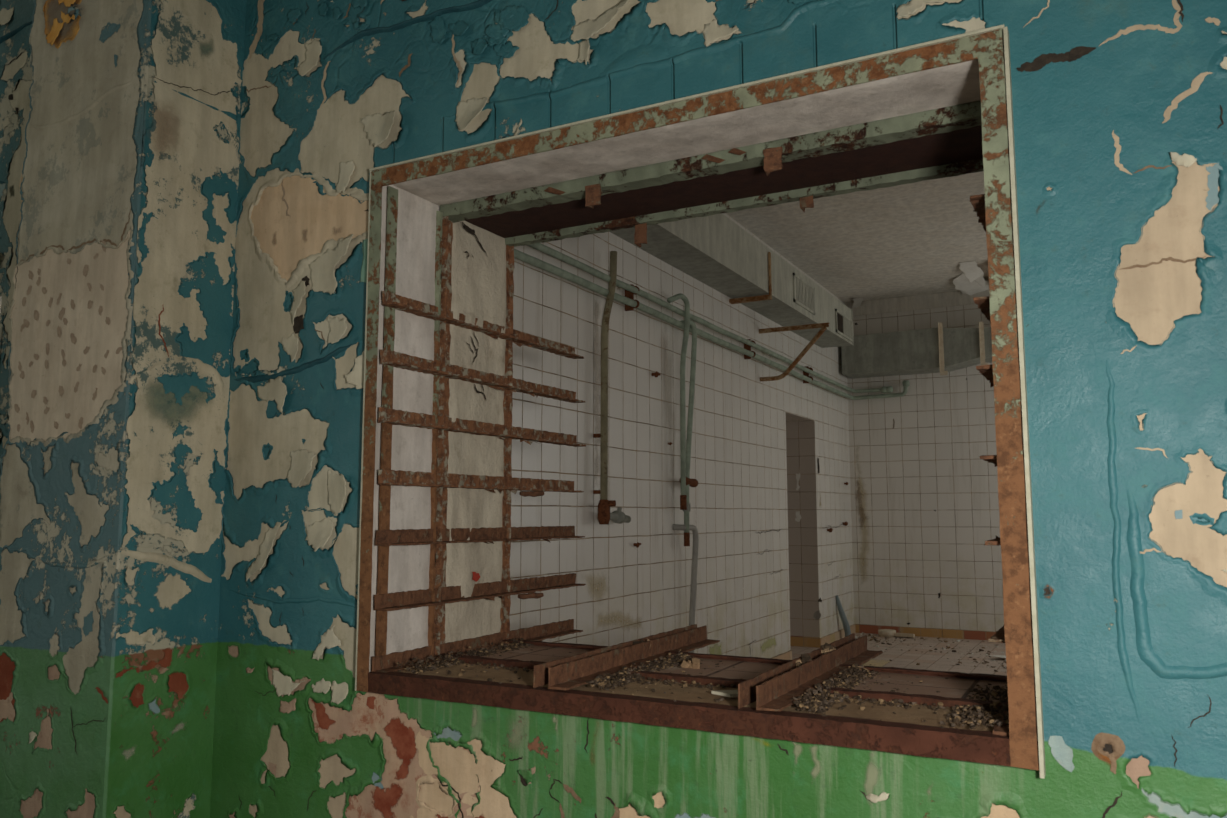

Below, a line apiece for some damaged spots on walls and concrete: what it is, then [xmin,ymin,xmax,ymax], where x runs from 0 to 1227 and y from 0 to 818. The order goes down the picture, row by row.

peeling [893,0,995,38]
peeling [449,0,744,143]
peeling [1207,27,1227,79]
rust [702,148,746,163]
peeling [1105,148,1227,356]
peeling [953,261,989,296]
peeling [0,0,522,818]
peeling [1130,409,1227,608]
peeling [1048,736,1075,772]
flaking render [612,784,715,818]
flaking render [933,791,1028,818]
peeling [1114,749,1227,818]